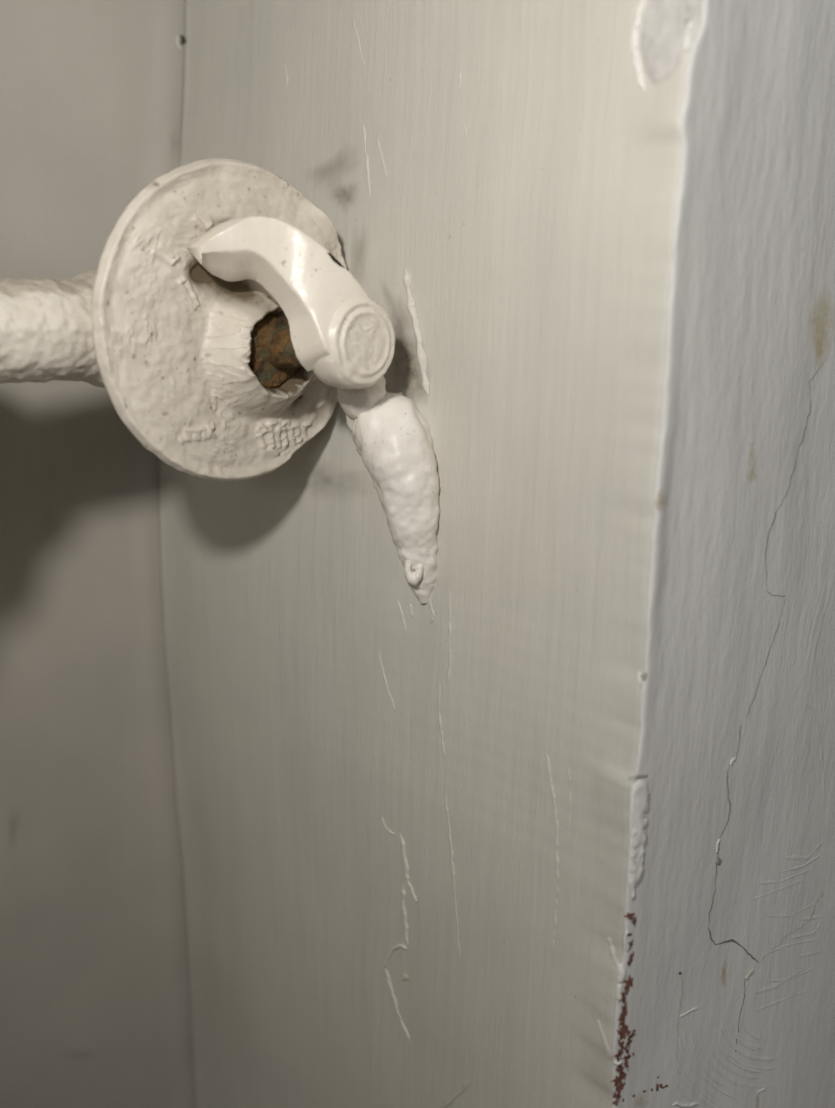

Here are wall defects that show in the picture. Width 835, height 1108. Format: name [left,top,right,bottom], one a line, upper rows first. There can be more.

flaking render [631,0,703,91]
crack [708,356,828,1052]